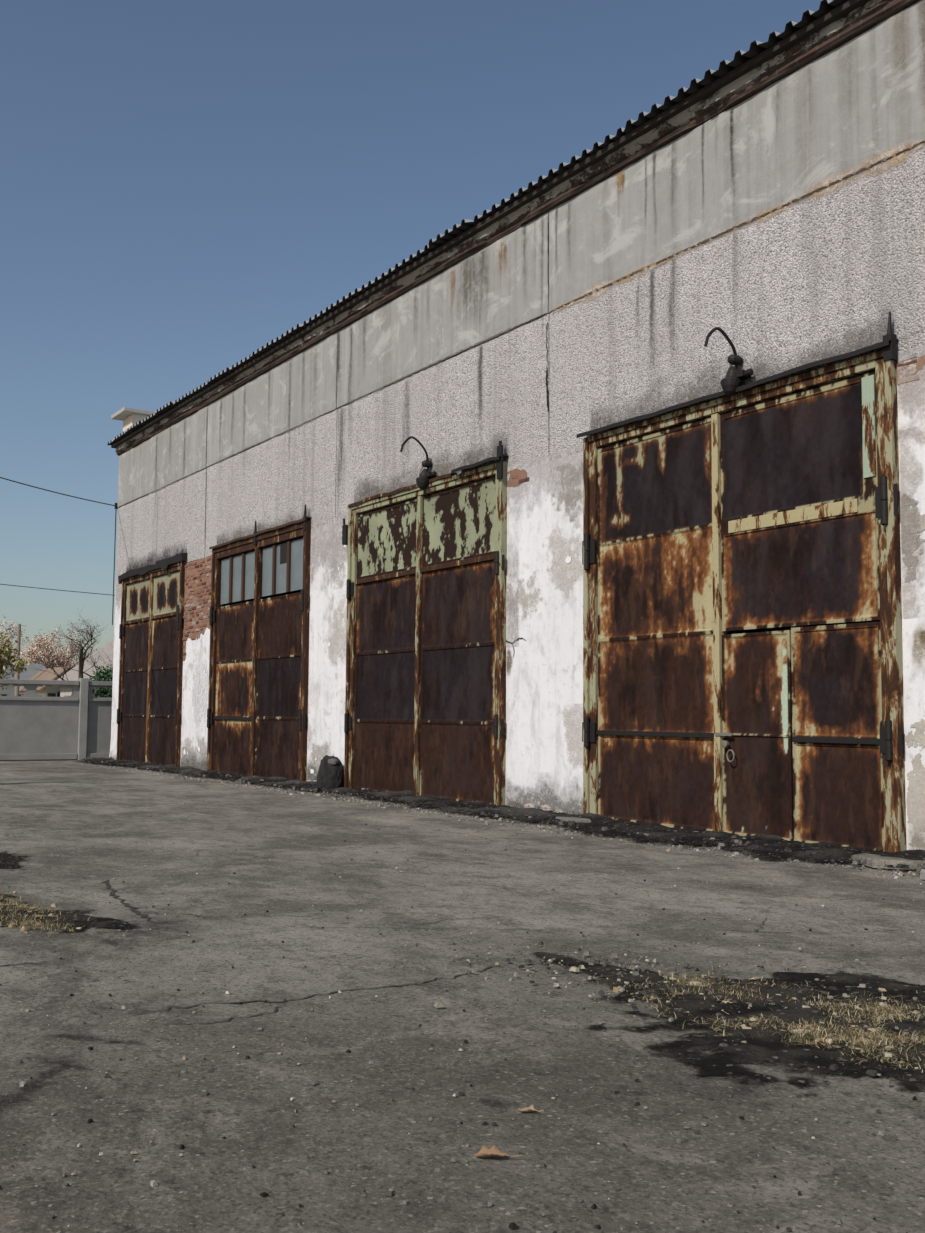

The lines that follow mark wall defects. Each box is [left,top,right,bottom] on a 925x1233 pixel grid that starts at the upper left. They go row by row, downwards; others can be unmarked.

leakage [637,272,654,340]
spalling [507,468,529,487]
peeling [896,355,925,618]
peeling [547,463,583,597]
spalling [182,556,212,661]
peeling [506,576,540,617]
peeling [563,703,583,765]
peeling [524,803,564,813]
crack [137,963,505,1024]